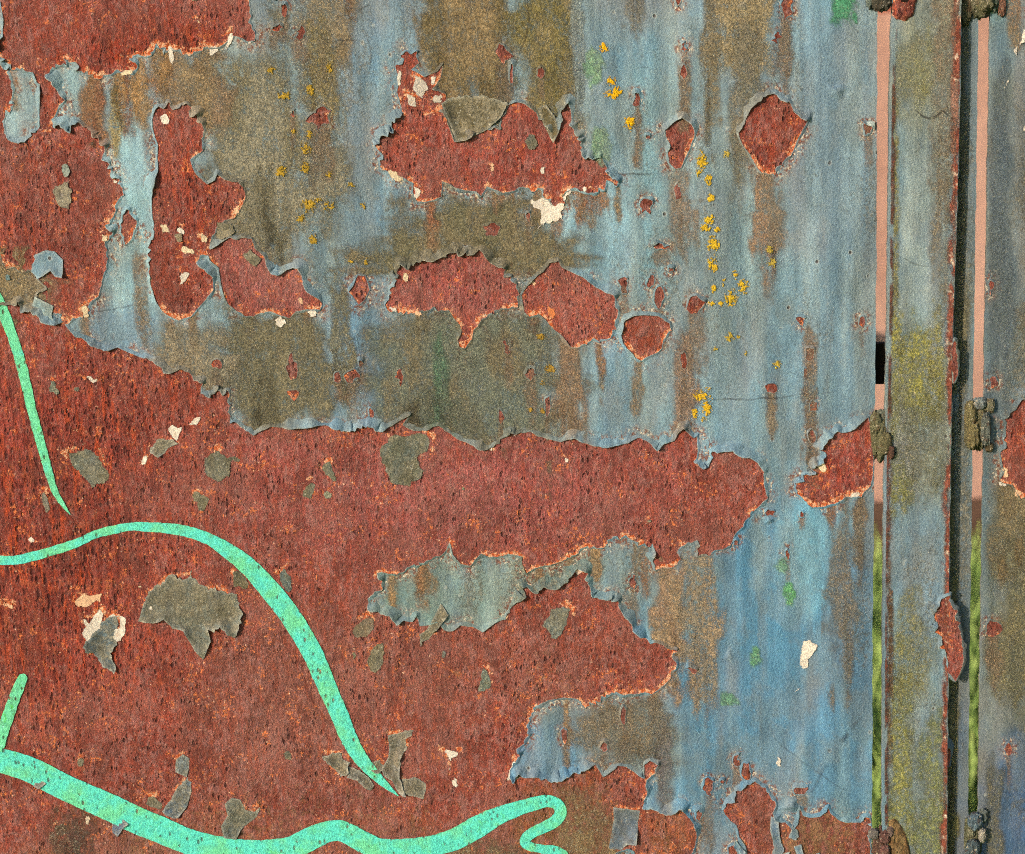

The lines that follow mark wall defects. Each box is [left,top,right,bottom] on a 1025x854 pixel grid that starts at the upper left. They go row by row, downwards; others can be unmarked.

peeling [771,0,795,56]
peeling [639,196,655,214]
rust [736,89,813,257]
rust [946,0,961,422]
peeling [617,275,629,316]
peeling [645,239,676,310]
peeling [679,293,708,379]
rust [0,0,770,854]
rust [794,327,893,825]
rust [928,459,967,854]
peeling [692,752,752,847]
rust [722,777,872,854]